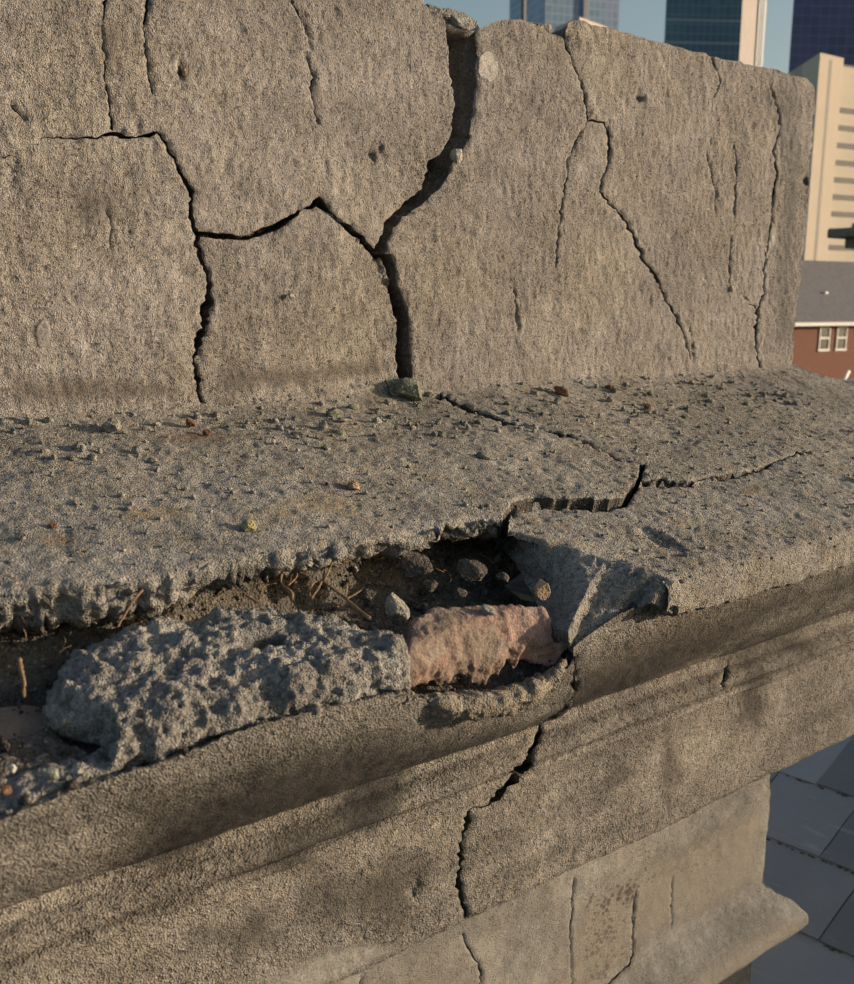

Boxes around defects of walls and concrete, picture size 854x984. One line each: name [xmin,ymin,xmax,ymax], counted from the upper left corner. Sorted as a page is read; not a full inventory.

crack [39,0,477,403]
crack [555,44,691,359]
crack [728,88,781,368]
crack [440,395,810,563]
spalling [0,520,500,636]
spalling [246,637,284,650]
crack [561,649,576,710]
leakage [135,732,513,876]
crack [455,724,542,984]
crack [567,879,575,965]
crack [608,905,633,984]